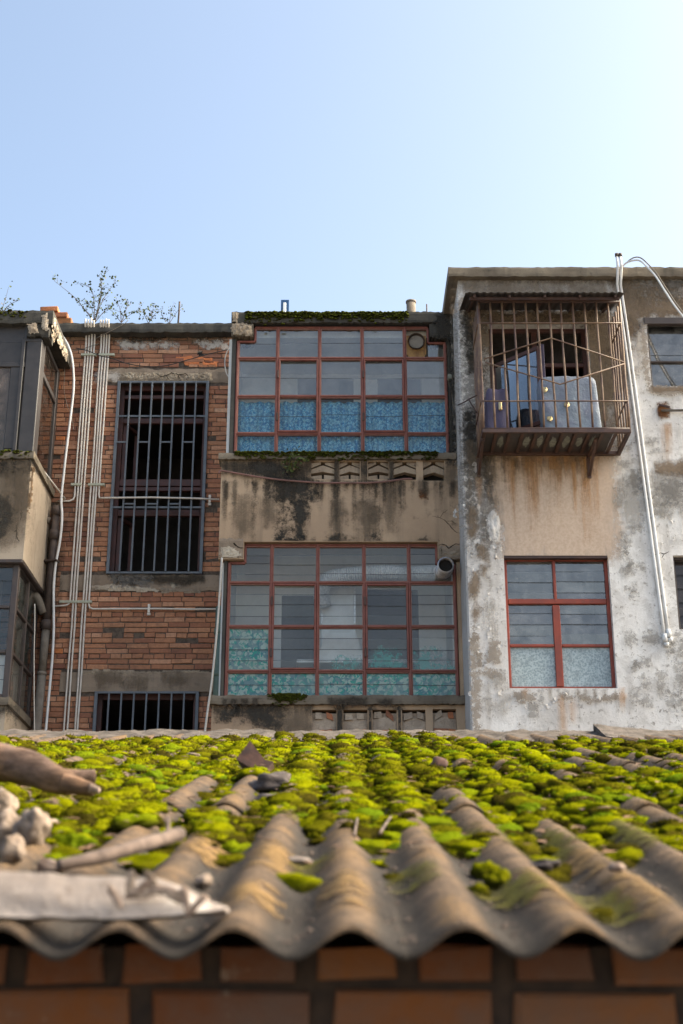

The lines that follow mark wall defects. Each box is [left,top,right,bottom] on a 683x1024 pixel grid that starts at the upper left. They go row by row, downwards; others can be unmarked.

leakage [221,279,683,541]
leakage [0,459,38,545]
peeling [468,607,620,730]